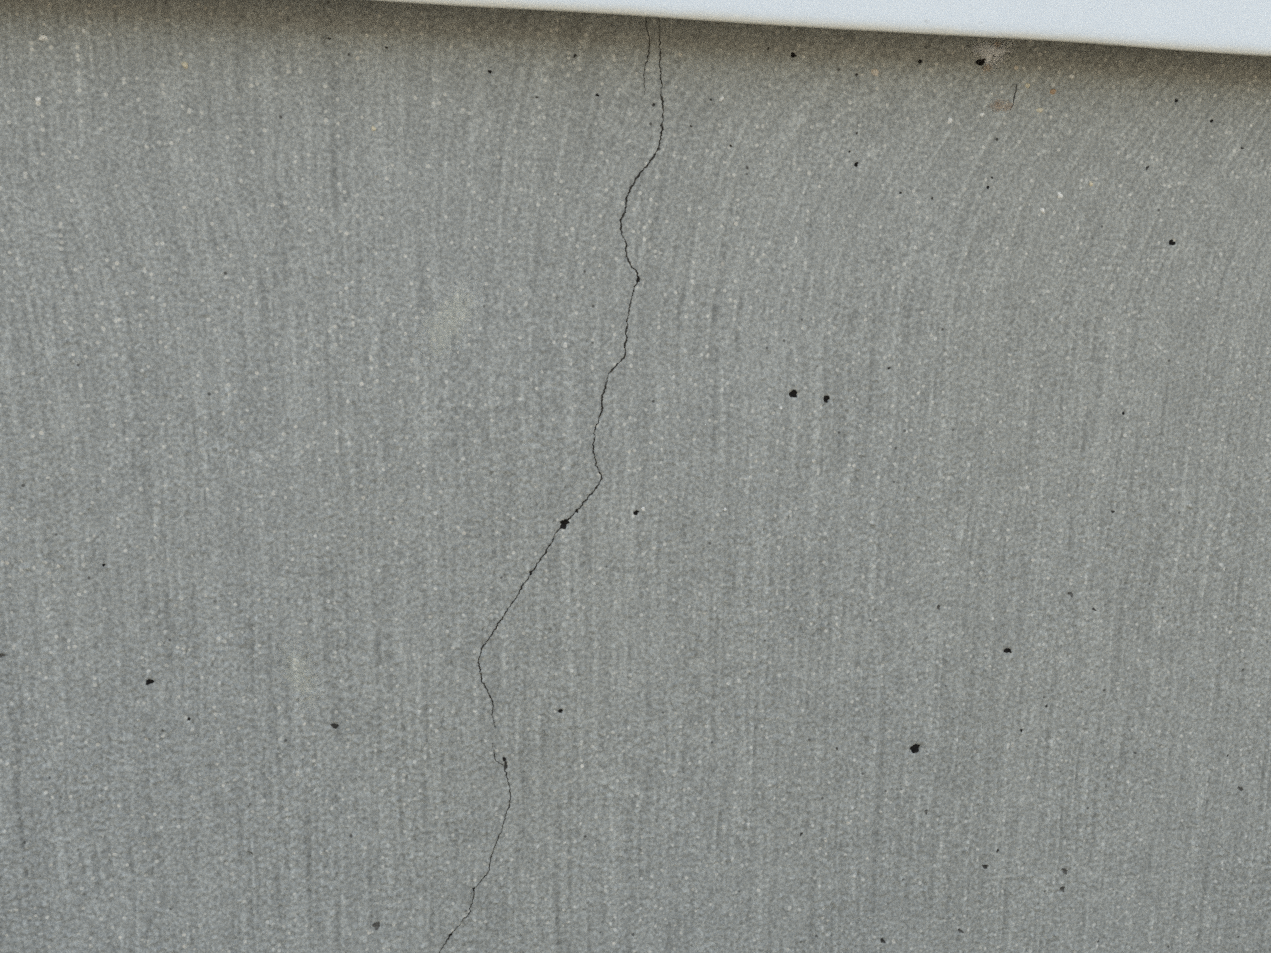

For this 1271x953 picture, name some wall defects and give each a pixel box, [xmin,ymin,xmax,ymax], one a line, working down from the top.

crack [439,17,664,953]